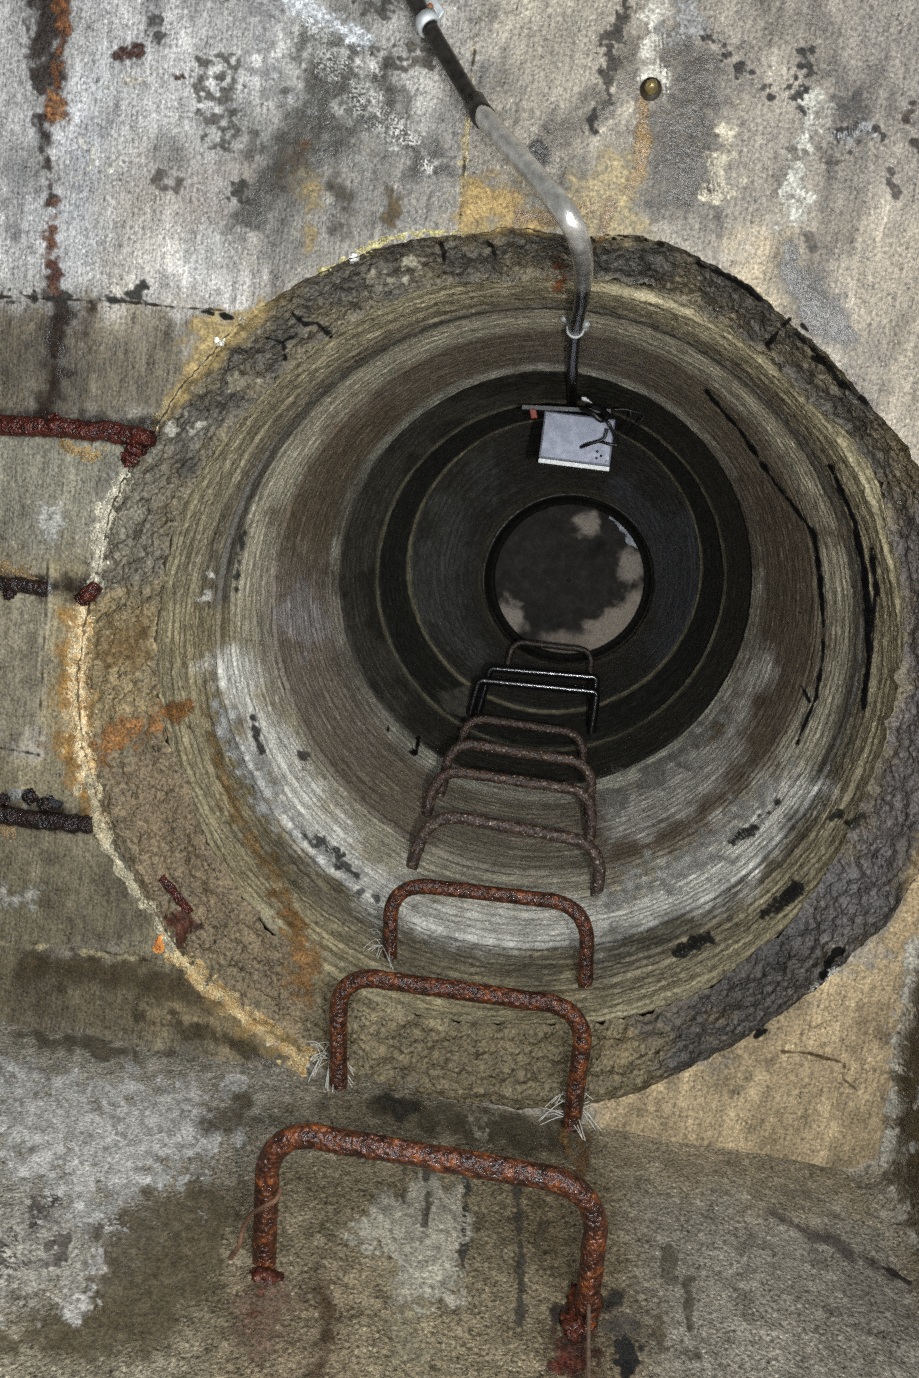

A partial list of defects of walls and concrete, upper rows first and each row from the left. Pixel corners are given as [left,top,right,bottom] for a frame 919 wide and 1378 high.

corrosion [22,0,95,418]
leakage [231,0,557,305]
crack [266,312,333,360]
corrosion [95,615,150,671]
leakage [0,464,319,1360]
corrosion [90,699,325,1009]
leakage [211,698,366,887]
leakage [370,1092,573,1157]
leakage [342,1165,475,1366]
leakage [513,1186,546,1326]